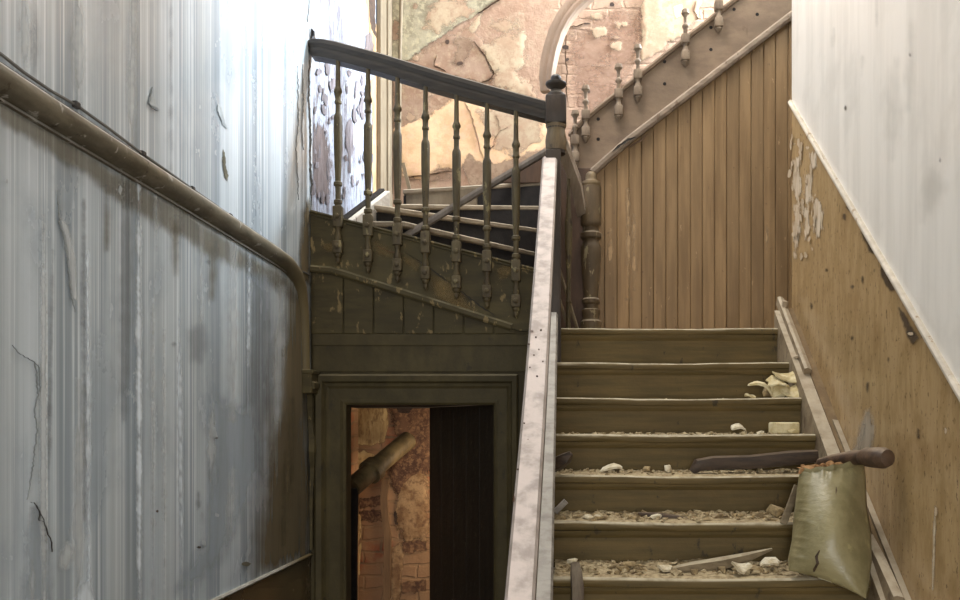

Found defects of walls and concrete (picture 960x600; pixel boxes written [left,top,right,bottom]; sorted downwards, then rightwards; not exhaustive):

peeling [365,0,377,52]
peeling [392,0,537,98]
spalling [562,0,701,111]
peeling [311,63,377,205]
peeling [393,81,547,186]
peeling [787,136,824,260]
crack [12,345,53,552]